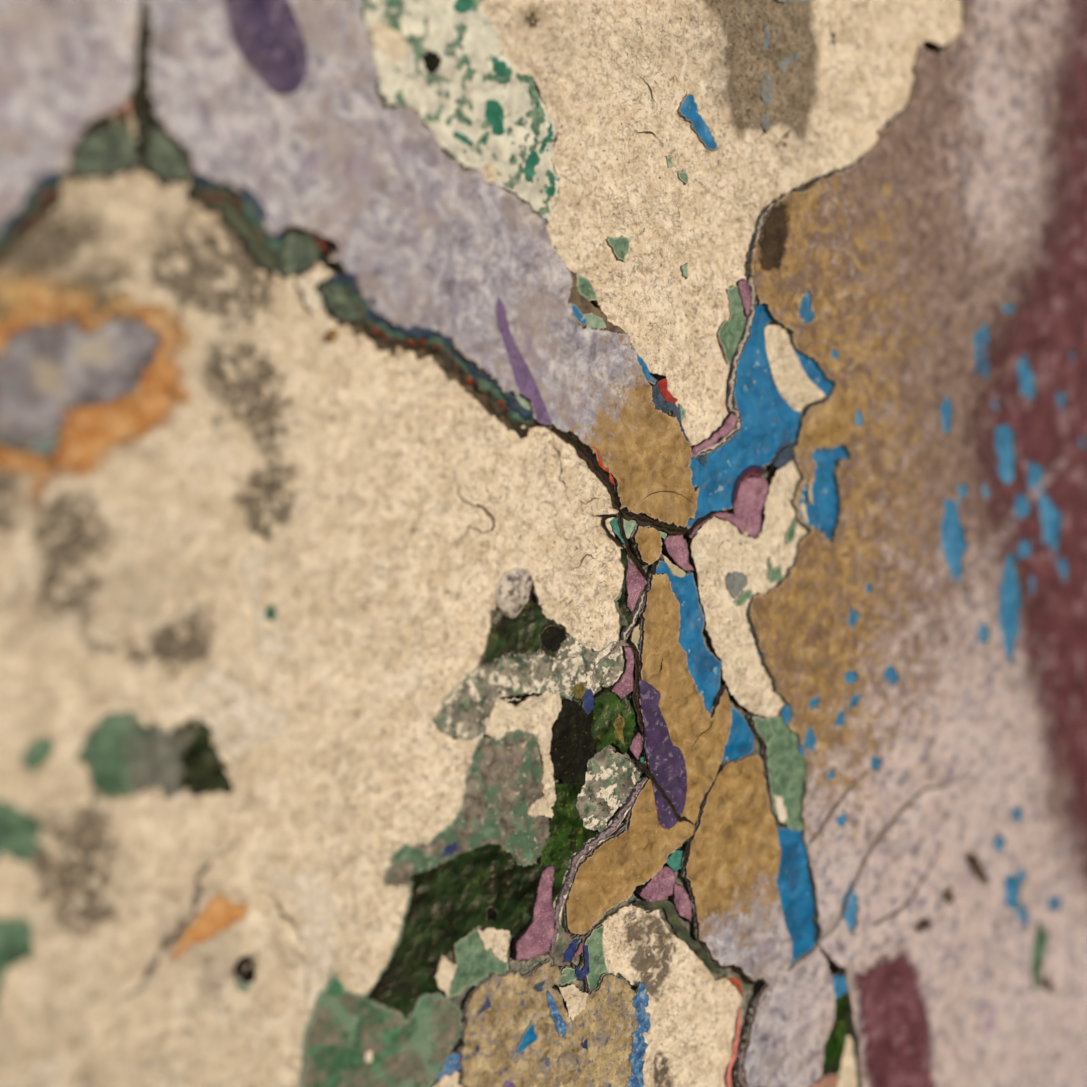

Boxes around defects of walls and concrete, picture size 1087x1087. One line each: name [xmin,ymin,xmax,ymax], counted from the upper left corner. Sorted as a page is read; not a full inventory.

crack [135,0,151,144]
spalling [361,0,975,466]
peeling [1017,352,1035,400]
spalling [0,102,863,1087]
crack [445,463,495,547]
crack [548,427,730,580]
peeling [940,484,967,585]
peeling [995,424,1015,486]
peeling [977,461,1067,667]
crack [625,639,727,968]
crack [97,832,241,1019]
crack [265,891,300,942]